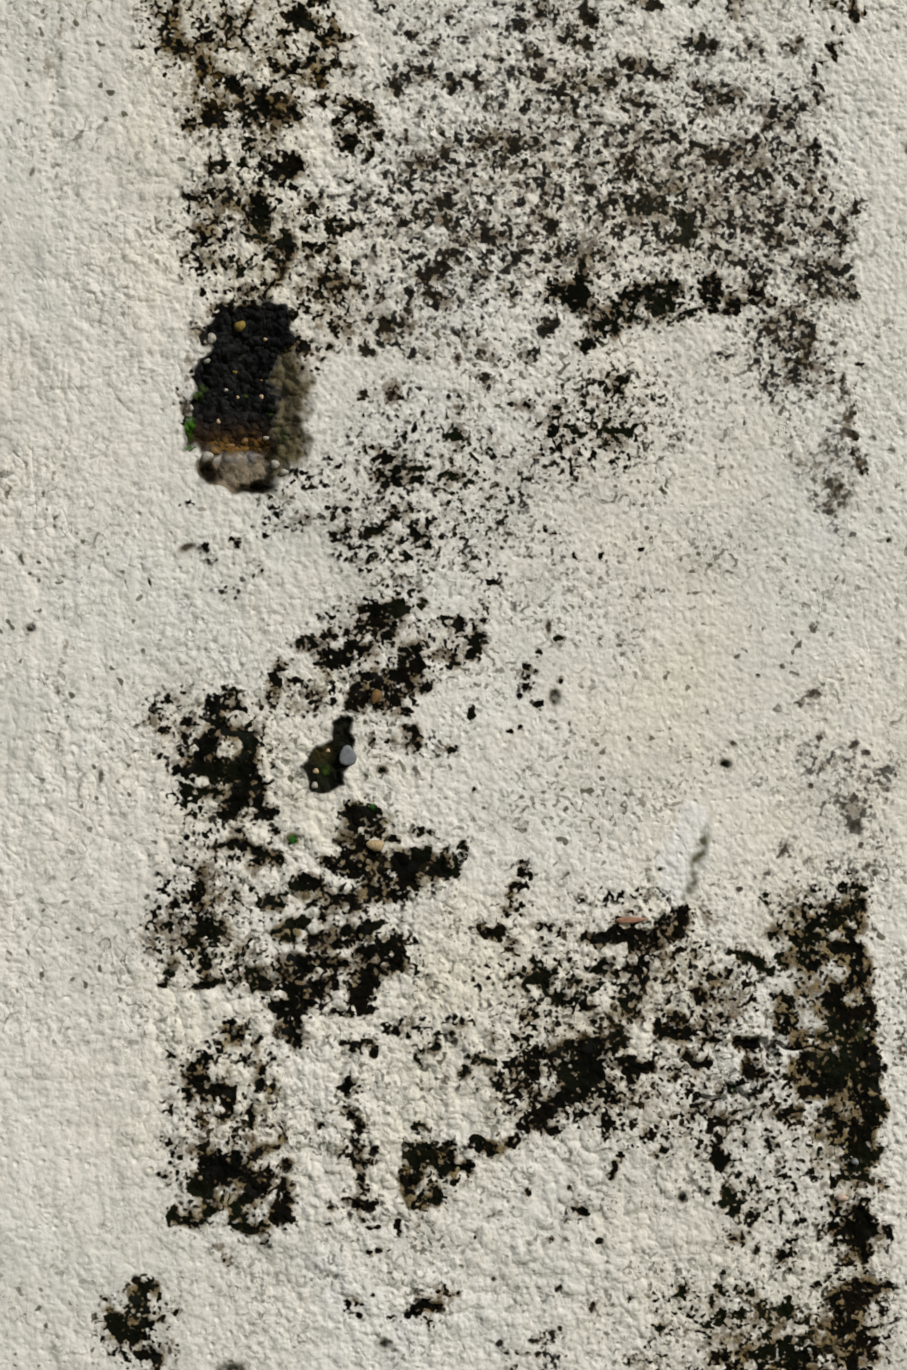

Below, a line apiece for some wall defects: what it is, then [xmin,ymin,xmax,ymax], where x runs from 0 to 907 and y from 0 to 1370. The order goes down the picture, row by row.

spalling [184,300,314,494]
water stain [134,0,869,545]
water stain [138,365,900,1370]
water stain [92,1274,179,1370]